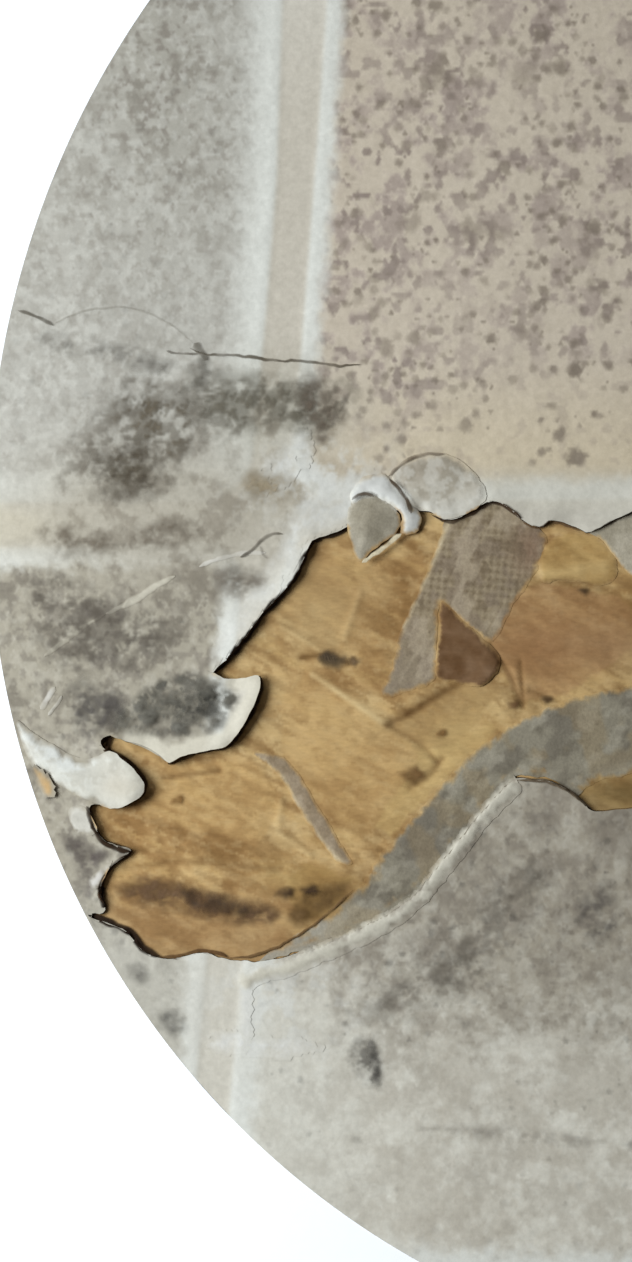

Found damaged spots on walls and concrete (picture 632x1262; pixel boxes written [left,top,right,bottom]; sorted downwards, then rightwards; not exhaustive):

crack [21,311,53,326]
crack [167,343,360,368]
damp [110,398,190,495]
peeling [538,531,618,586]
damp [214,571,259,588]
damp [71,600,160,668]
peeling [16,427,487,836]
damp [75,695,120,725]
peeling [88,860,113,889]